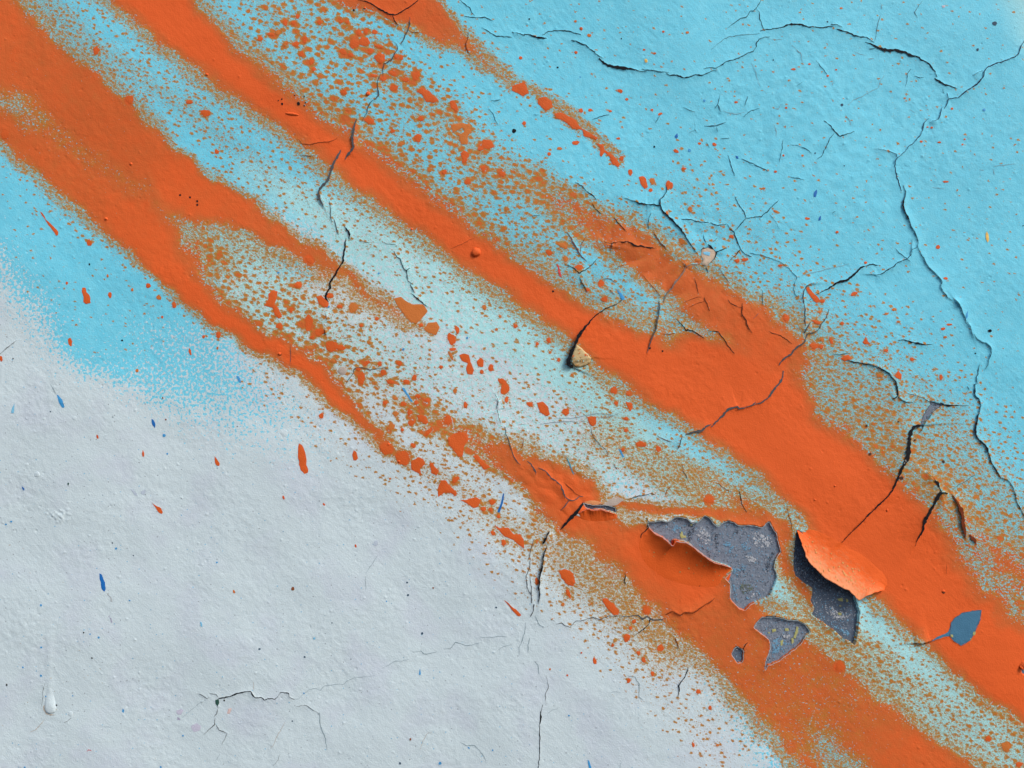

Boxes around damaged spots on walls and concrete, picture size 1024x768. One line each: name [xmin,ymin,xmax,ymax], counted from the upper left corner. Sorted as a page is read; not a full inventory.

crack [299,0,426,335]
crack [461,1,1024,543]
peeling [571,345,591,367]
crack [189,395,715,767]
peeling [639,516,781,610]
peeling [732,646,744,664]
peeling [754,529,887,669]
peeling [932,610,982,646]